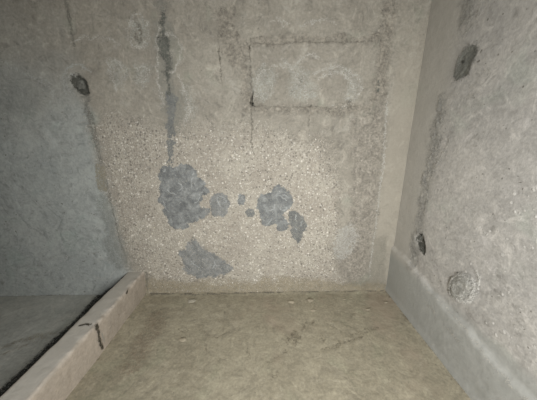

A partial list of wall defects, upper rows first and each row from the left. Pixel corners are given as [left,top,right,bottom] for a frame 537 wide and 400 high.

leakage [150,0,185,172]
spalling [70,74,348,293]
crack [249,36,373,154]
peeling [406,90,450,271]
spalling [452,40,479,81]
crack [79,323,105,349]